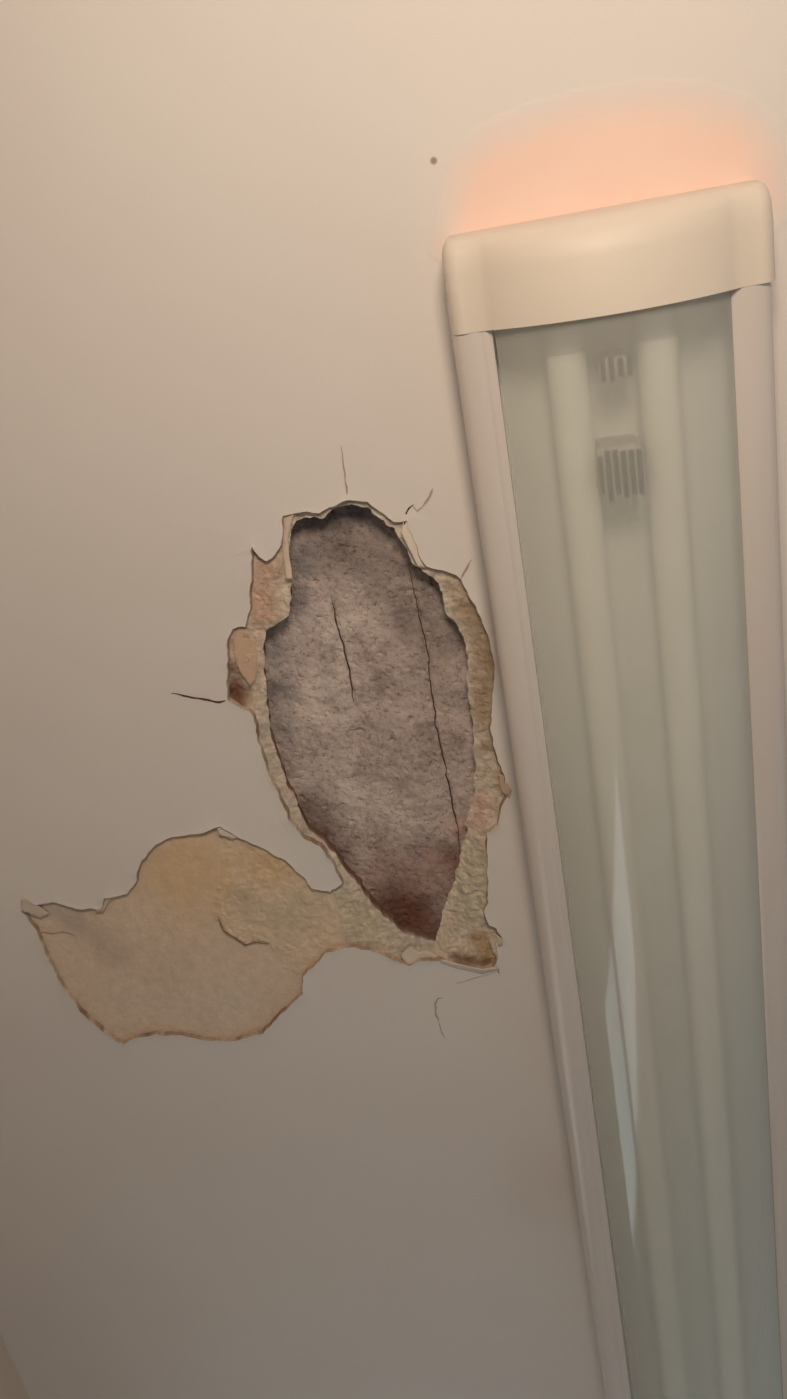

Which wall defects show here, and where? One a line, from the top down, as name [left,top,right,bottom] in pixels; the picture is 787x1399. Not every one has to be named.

spalling [21,500,512,1044]